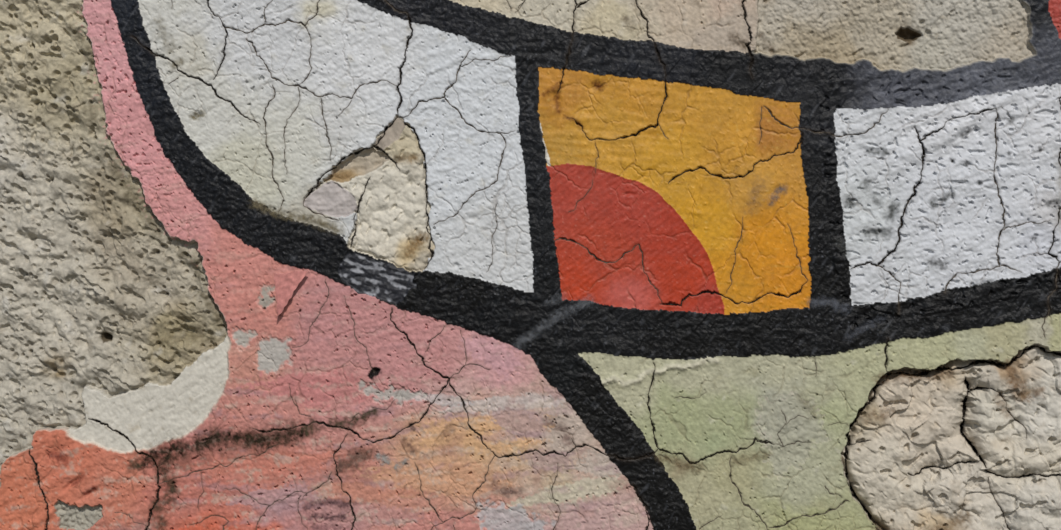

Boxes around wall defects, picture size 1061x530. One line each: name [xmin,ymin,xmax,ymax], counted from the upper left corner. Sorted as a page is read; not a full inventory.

crack [131,0,513,271]
crack [557,0,589,93]
crack [569,1,667,212]
crack [742,0,753,78]
spalling [753,0,1036,72]
spalling [304,115,435,305]
peeling [255,271,308,319]
crack [88,106,1061,530]
crack [29,449,49,530]
spalling [54,501,103,530]
peeling [67,327,294,454]
spalling [841,344,1061,530]